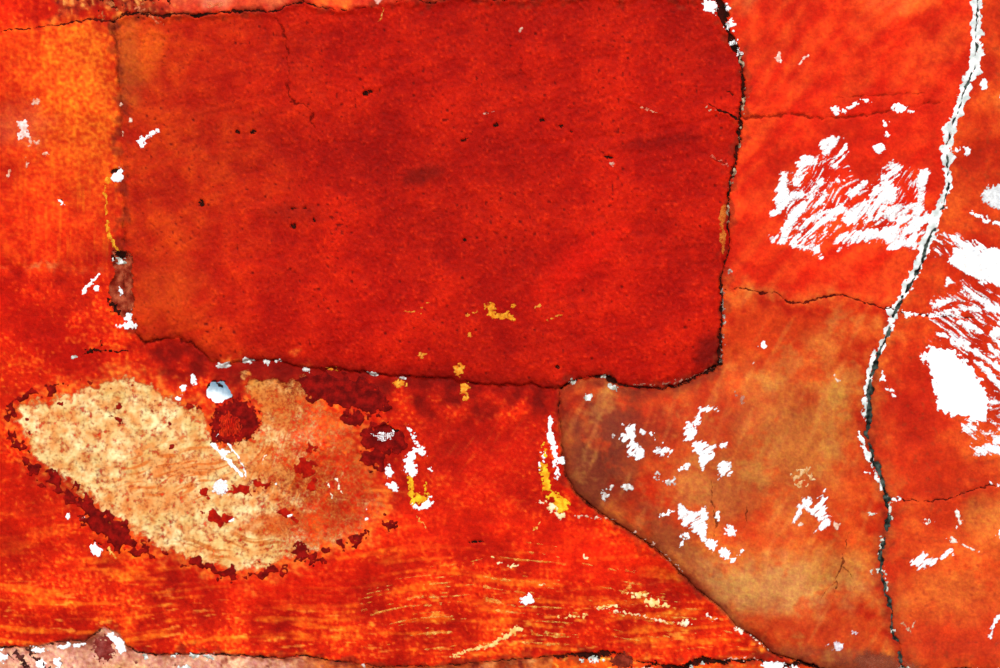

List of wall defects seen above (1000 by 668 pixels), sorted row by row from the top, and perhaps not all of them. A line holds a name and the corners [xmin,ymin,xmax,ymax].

crack [4,0,359,53]
peeling [819,135,849,168]
peeling [943,232,1000,287]
peeling [927,277,983,334]
crack [547,0,1000,668]
crack [140,337,431,388]
crack [453,363,497,401]
peeling [4,367,417,584]
crack [449,454,820,668]
peeling [704,511,744,563]
peeling [450,576,696,658]
crack [0,628,423,668]